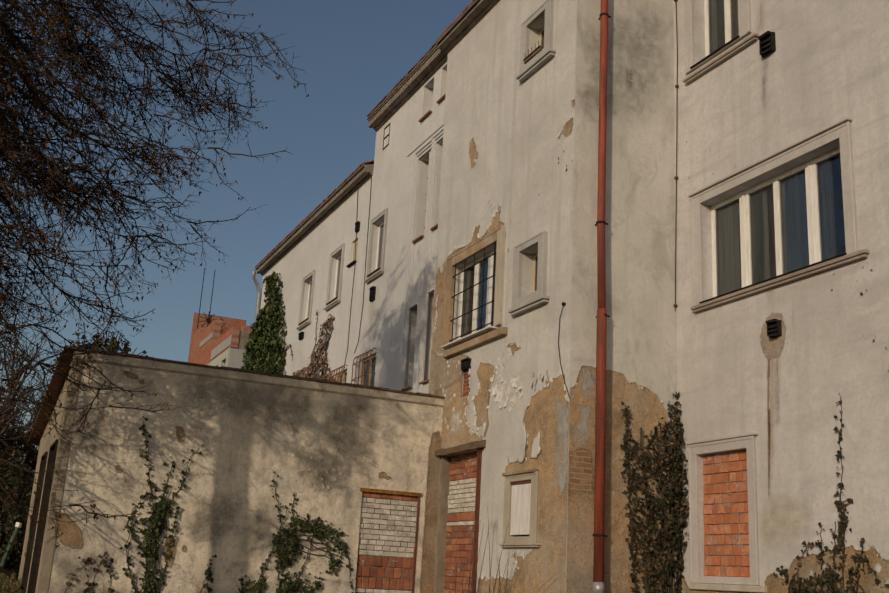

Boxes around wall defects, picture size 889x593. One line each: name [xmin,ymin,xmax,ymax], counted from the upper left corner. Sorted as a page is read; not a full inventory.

spalling [557,99,575,139]
spalling [469,137,479,169]
flaking render [420,199,511,593]
spalling [176,426,185,442]
flaking render [477,365,670,593]
spalling [55,512,83,548]
spalling [163,535,186,567]
flaking render [681,544,889,593]